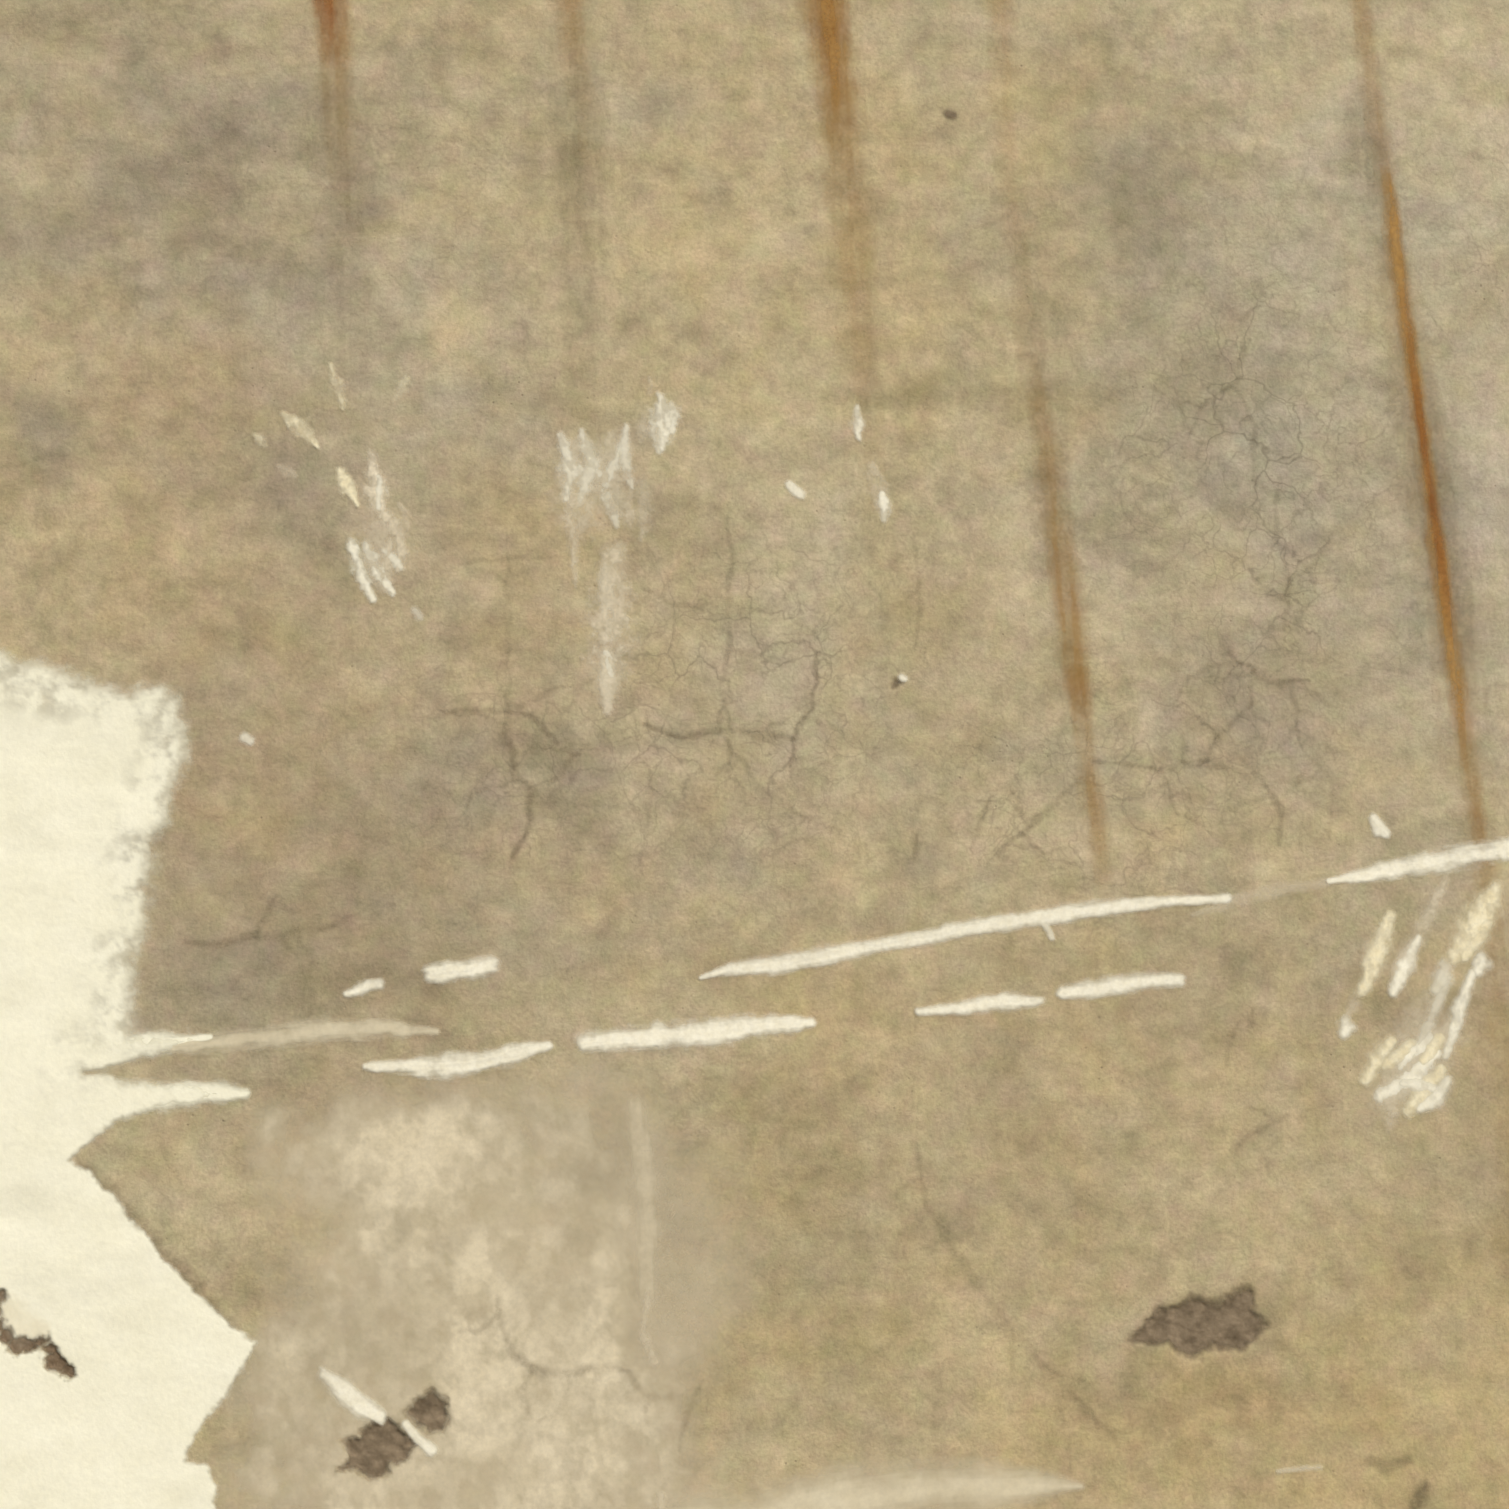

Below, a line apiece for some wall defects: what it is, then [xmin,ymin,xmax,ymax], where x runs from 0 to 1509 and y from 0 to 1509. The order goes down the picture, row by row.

corrosion [1386,180,1465,733]
peeling [0,653,255,1509]
spalling [320,1368,448,1478]
spalling [1131,1290,1267,1356]